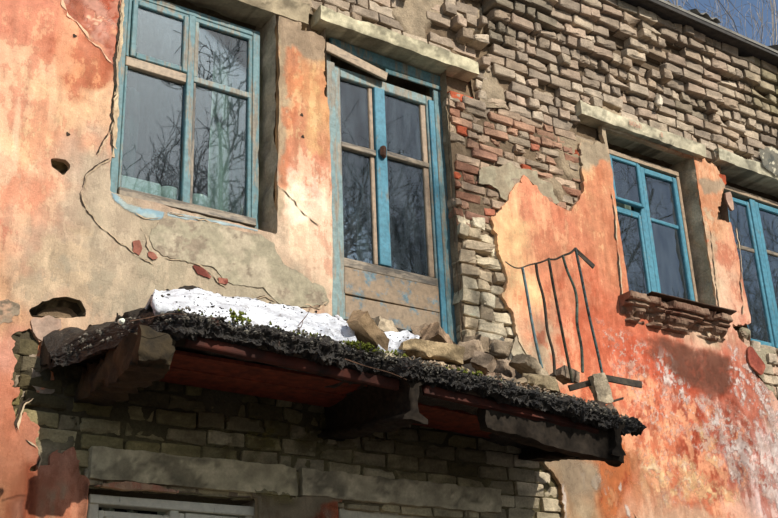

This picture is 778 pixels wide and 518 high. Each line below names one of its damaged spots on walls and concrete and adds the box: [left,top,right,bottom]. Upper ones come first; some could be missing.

peeling [61,0,125,64]
spalling [51,159,68,175]
crack [80,0,227,288]
spalling [297,0,778,404]
spalling [0,298,561,518]
leakage [605,332,778,508]